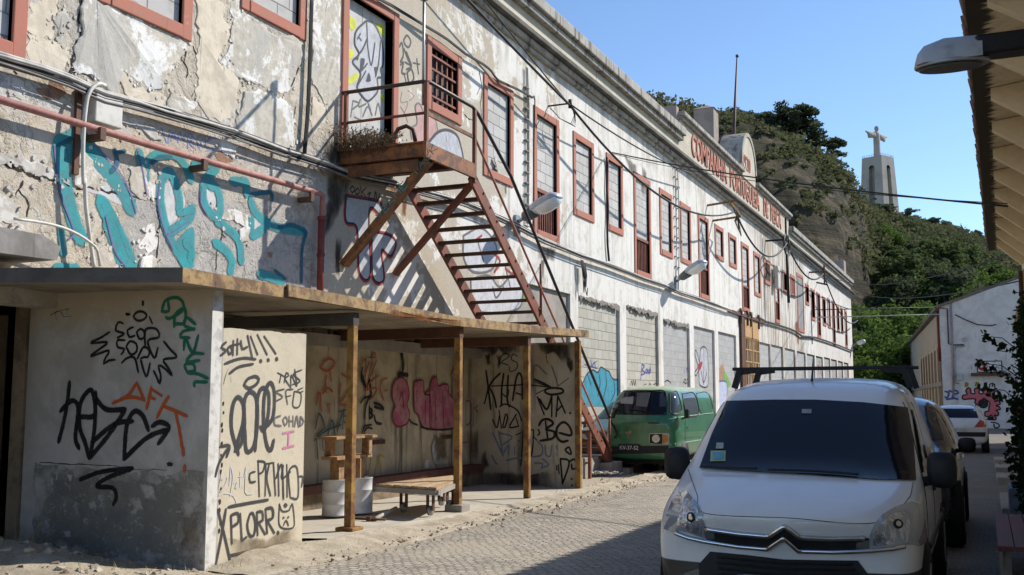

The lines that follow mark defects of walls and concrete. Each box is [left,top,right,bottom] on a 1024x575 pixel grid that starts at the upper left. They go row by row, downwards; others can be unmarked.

peeling [5,71,66,100]
peeling [26,0,341,163]
peeling [0,145,162,202]